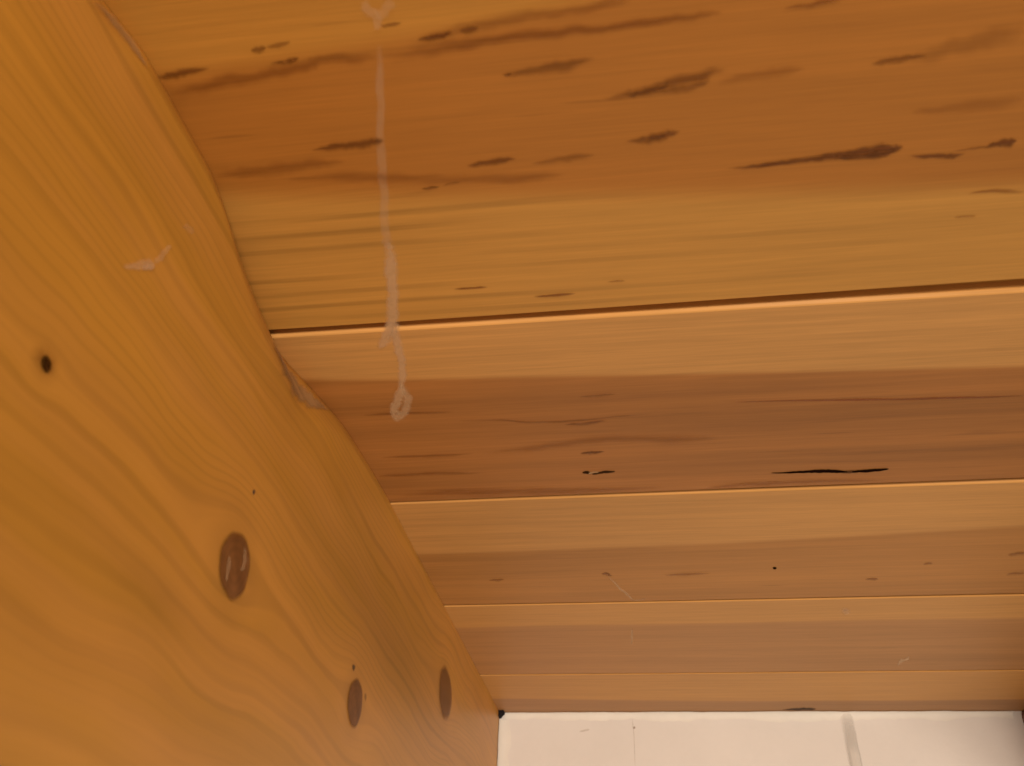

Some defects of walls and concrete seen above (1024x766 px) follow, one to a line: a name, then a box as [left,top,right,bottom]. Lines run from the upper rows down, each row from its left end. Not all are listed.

crack [583,469,615,477]
crack [780,467,888,475]